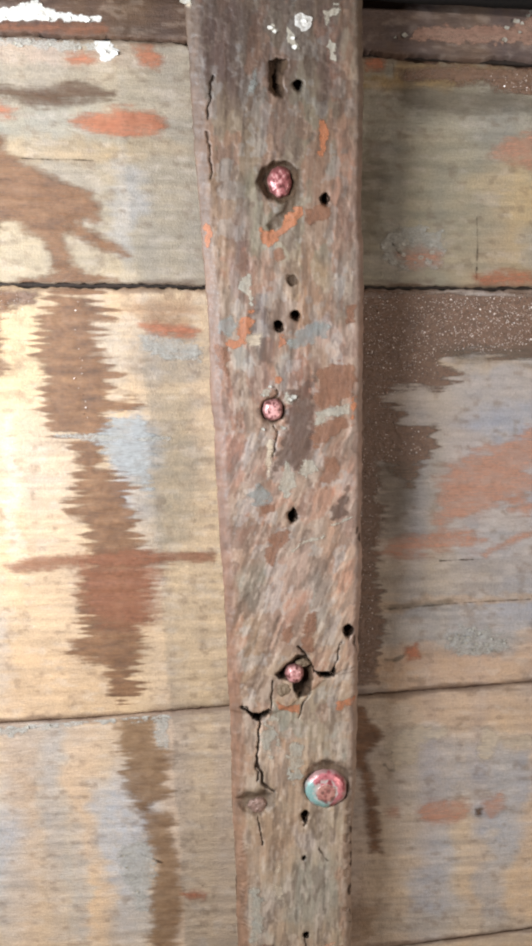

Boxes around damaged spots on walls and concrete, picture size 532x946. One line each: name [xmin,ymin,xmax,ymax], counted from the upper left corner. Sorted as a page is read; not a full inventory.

crack [300,637,355,714]
crack [240,703,274,791]